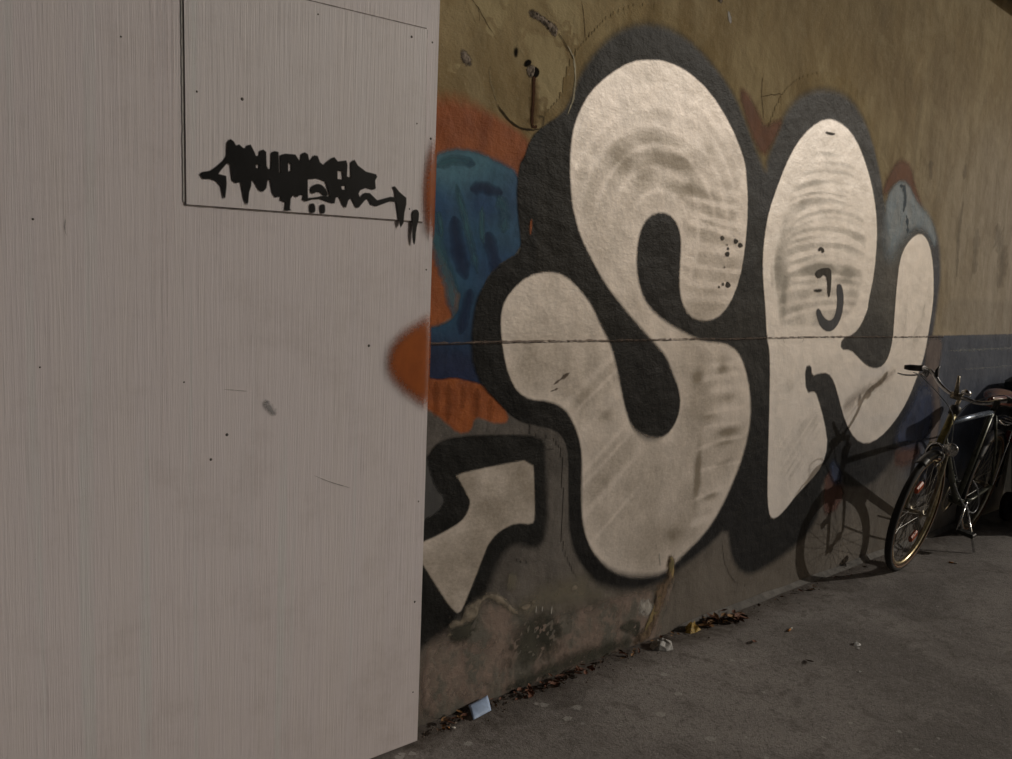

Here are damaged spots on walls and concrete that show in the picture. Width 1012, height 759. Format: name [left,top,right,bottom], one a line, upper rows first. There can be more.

crack [431,334,944,345]